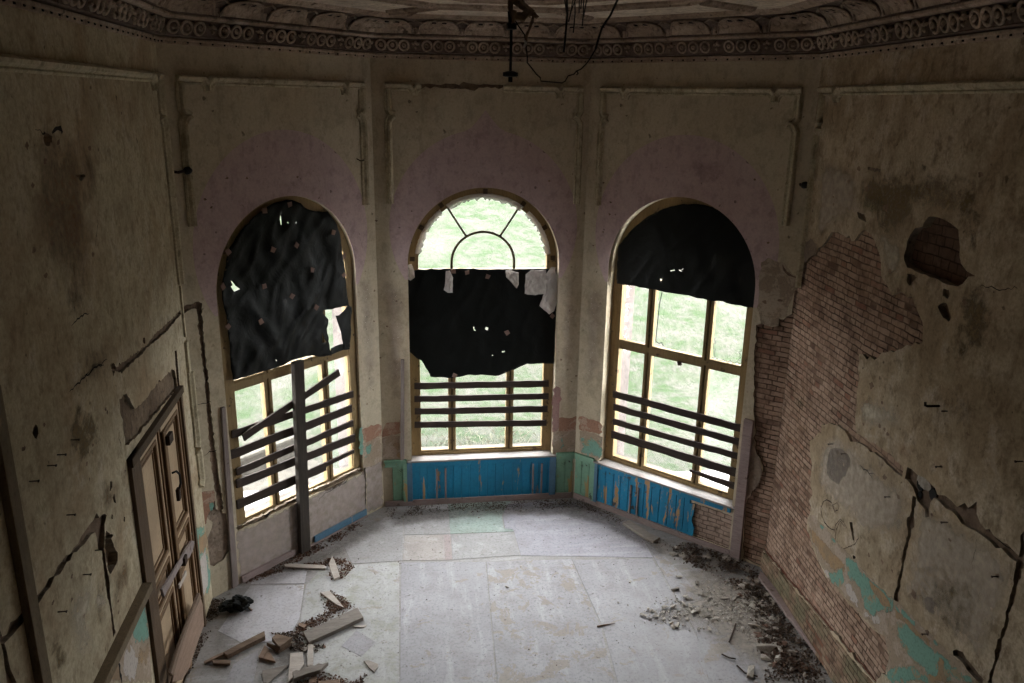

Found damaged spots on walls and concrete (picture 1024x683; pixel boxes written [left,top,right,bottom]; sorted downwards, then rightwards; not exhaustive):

crack [70,359,107,391]
peeling [309,422,400,493]
peeling [551,386,603,459]
flaking render [743,212,974,683]